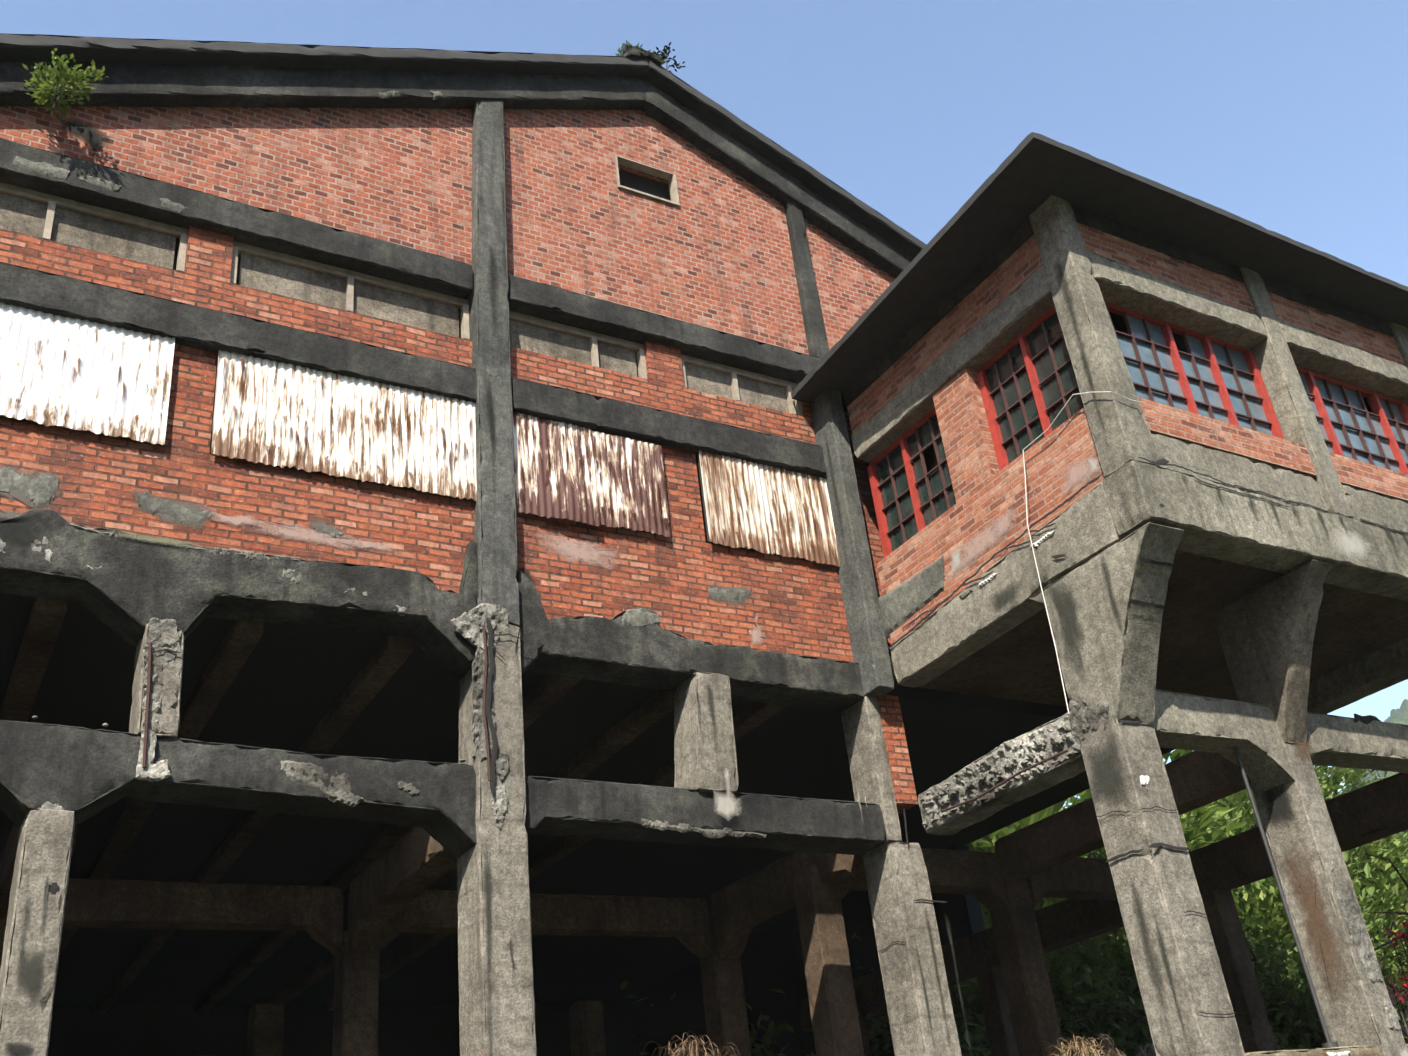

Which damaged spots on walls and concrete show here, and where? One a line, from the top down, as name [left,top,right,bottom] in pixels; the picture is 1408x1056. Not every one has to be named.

corrosion [222,357,248,425]
corrosion [255,398,333,457]
corrosion [353,415,410,473]
corrosion [438,420,471,474]
corrosion [546,433,612,488]
corrosion [601,482,668,527]
corrosion [712,489,750,540]
corrosion [766,490,834,556]
spalling [136,617,179,782]
spalling [450,603,509,830]
spalling [281,760,367,807]
spalling [398,781,419,796]